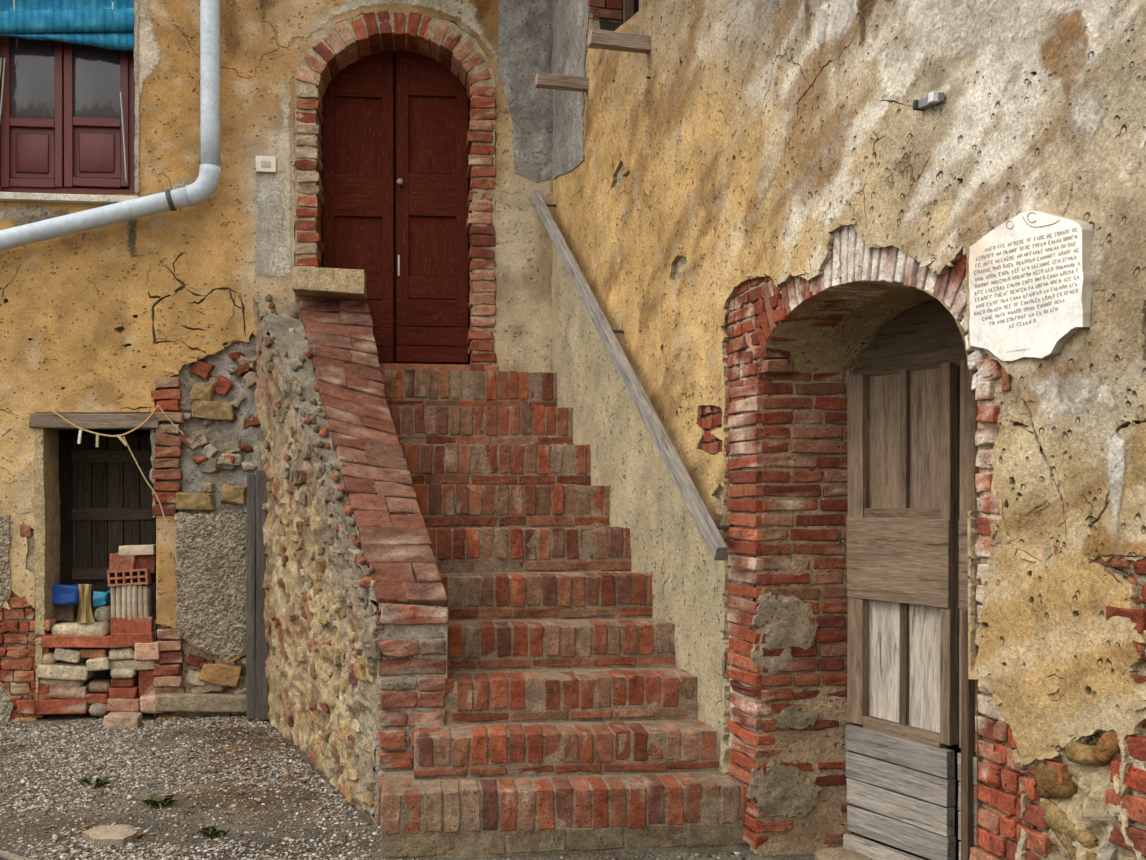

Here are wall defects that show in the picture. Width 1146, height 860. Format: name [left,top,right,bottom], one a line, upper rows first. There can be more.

water stain [1041,10,1088,99]
crack [148,252,246,353]
spalling [916,257,969,331]
spalling [149,334,262,517]
spalling [974,348,1099,428]
crack [1020,385,1060,485]
spalling [698,219,858,782]
spalling [977,468,1022,539]
spalling [0,592,56,720]
spalling [969,554,1146,860]